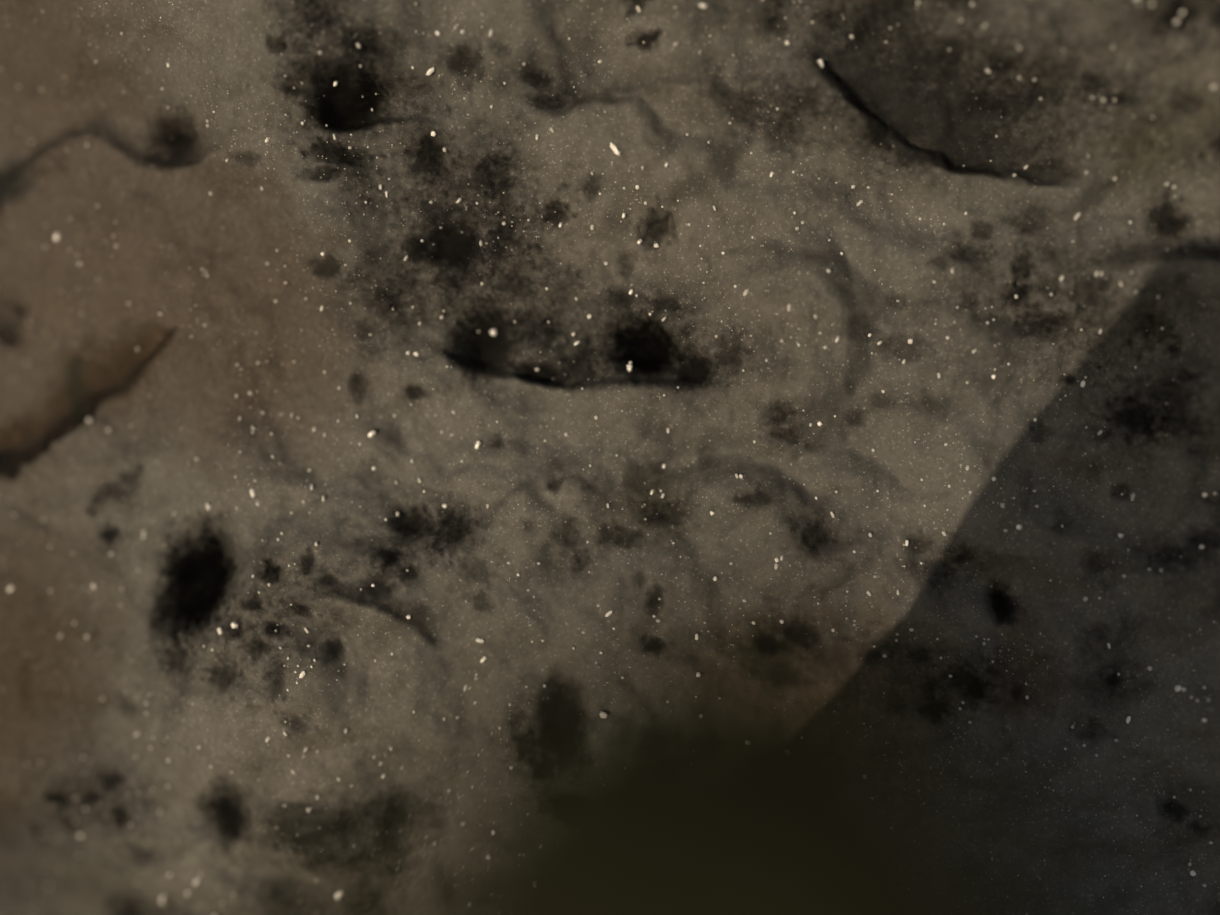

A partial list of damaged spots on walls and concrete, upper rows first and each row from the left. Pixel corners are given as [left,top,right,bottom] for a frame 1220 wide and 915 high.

crack [0,326,169,480]
water stain [0,0,317,429]